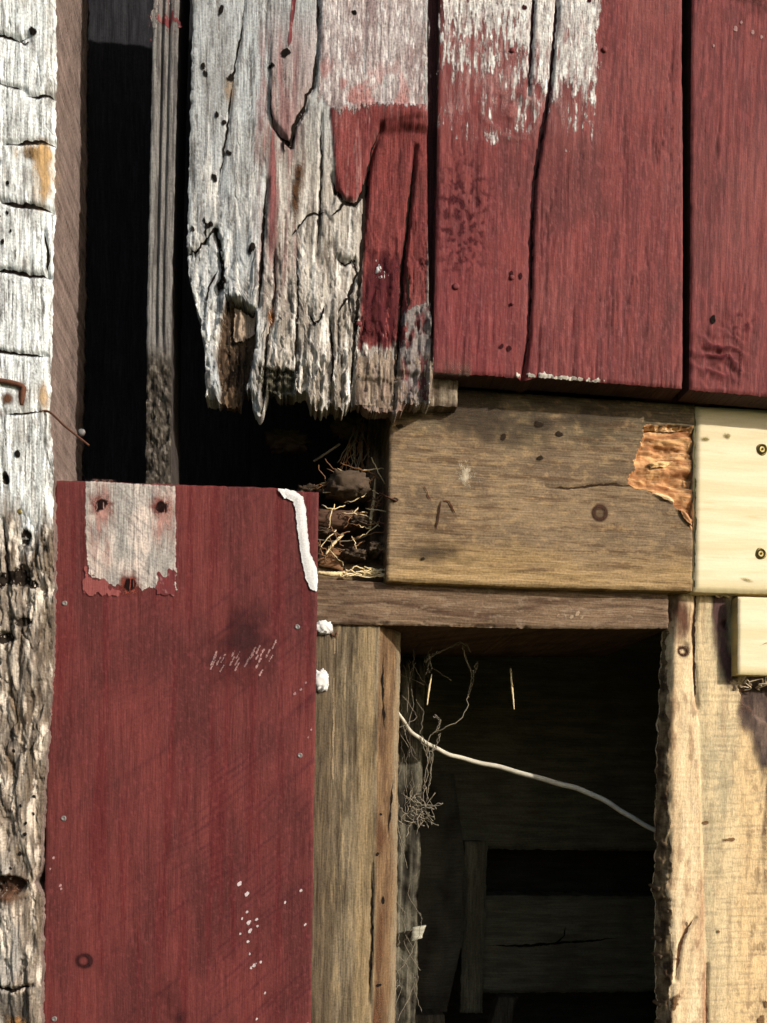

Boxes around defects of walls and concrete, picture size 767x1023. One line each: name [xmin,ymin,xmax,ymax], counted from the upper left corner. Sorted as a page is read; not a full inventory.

crack [0,202,54,279]
crack [3,140,56,148]
corrosion [25,144,53,200]
crack [190,217,225,302]
crack [217,3,245,194]
crack [258,0,379,410]
peeling [315,0,601,145]
crack [520,0,557,384]
peeling [233,308,256,342]
spalling [258,366,298,395]
peeling [356,250,434,409]
peeling [82,481,177,596]